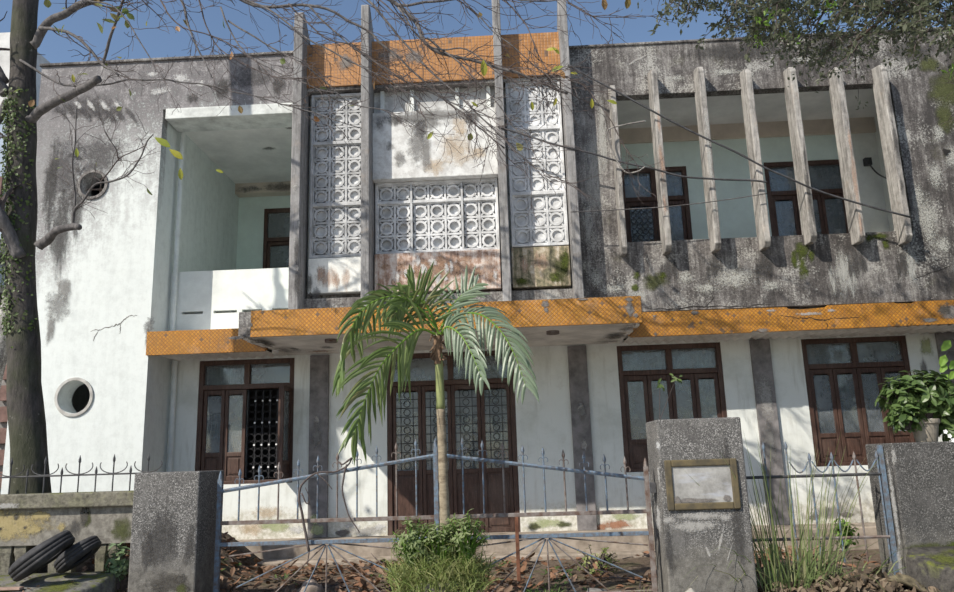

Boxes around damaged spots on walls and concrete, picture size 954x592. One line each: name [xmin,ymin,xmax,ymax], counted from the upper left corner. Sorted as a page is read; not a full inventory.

water stain [216,68,285,97]
water stain [56,96,138,124]
water stain [377,110,478,166]
water stain [42,142,121,263]
rust [318,269,349,285]
water stain [47,281,70,341]
peeling [601,297,638,343]
peeling [923,306,954,322]